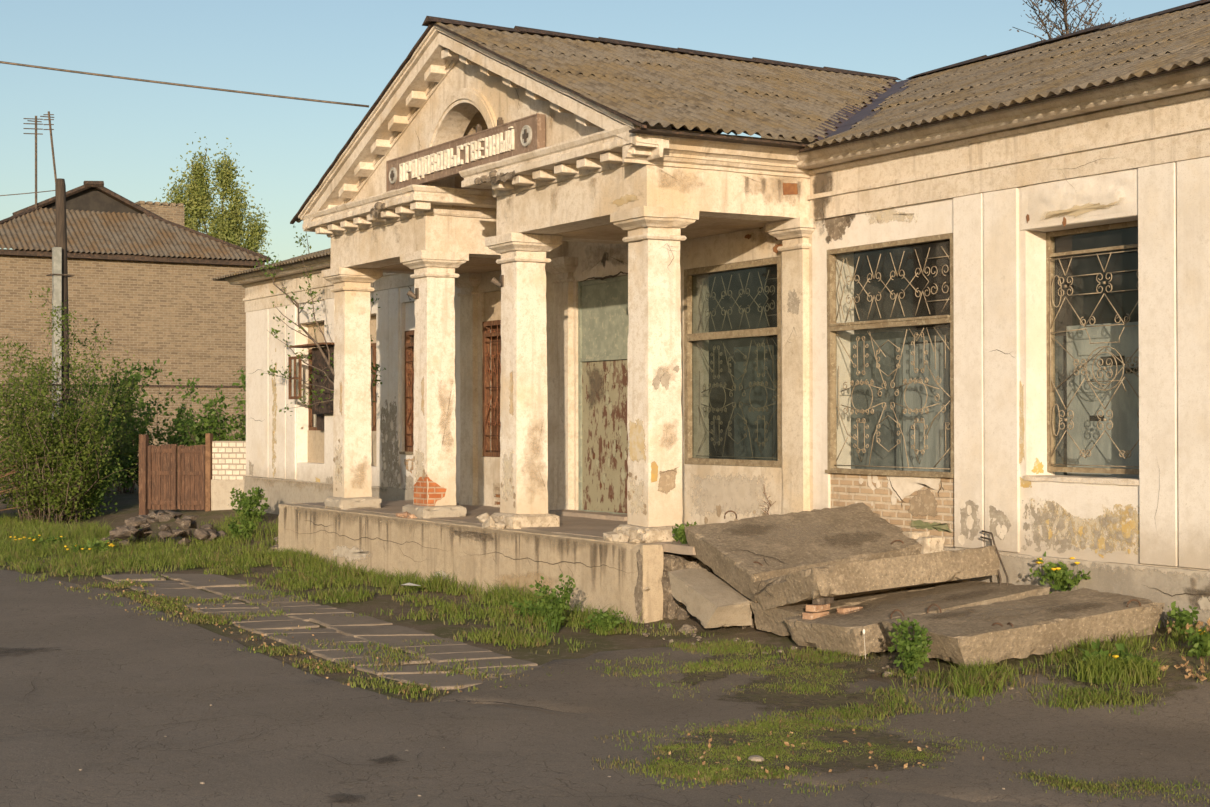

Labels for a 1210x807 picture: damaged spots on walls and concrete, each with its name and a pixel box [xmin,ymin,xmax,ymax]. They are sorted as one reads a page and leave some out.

rust [587,369,616,406]
peeling [380,399,447,506]
flaking render [855,475,937,517]
peeling [944,382,1210,578]
crack [298,520,626,579]